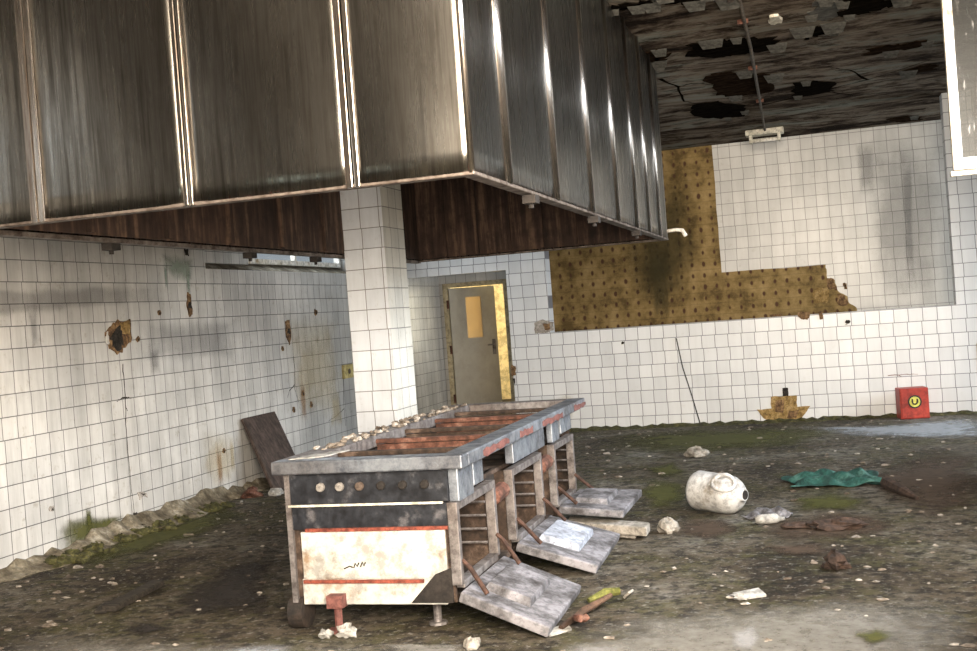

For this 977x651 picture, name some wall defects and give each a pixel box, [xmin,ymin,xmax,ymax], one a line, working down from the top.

spalling [645,48,672,71]
spalling [685,0,913,58]
spalling [861,40,934,58]
spalling [690,71,837,121]
peeling [534,145,857,333]
spalling [105,319,140,355]